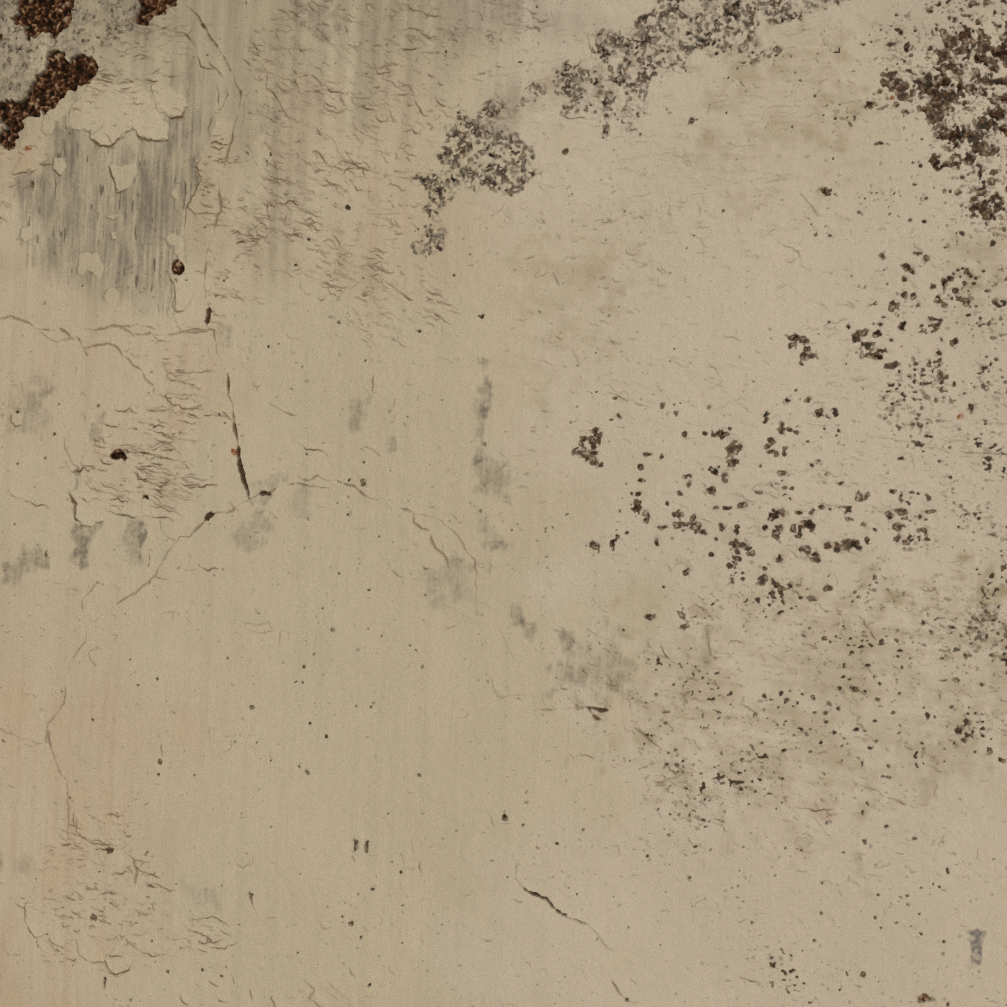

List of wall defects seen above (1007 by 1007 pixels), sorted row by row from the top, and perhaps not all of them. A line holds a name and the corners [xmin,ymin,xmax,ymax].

peeling [0,0,853,331]
flaking render [864,0,1007,229]
flaking render [846,252,930,370]
flaking render [914,269,1007,414]
crack [0,5,516,841]
flaking render [572,428,604,469]
flaking render [619,452,756,581]
flaking render [702,427,794,511]
flaking render [759,411,800,469]
flaking render [755,555,833,607]
flaking render [762,490,877,564]
crack [514,862,616,953]